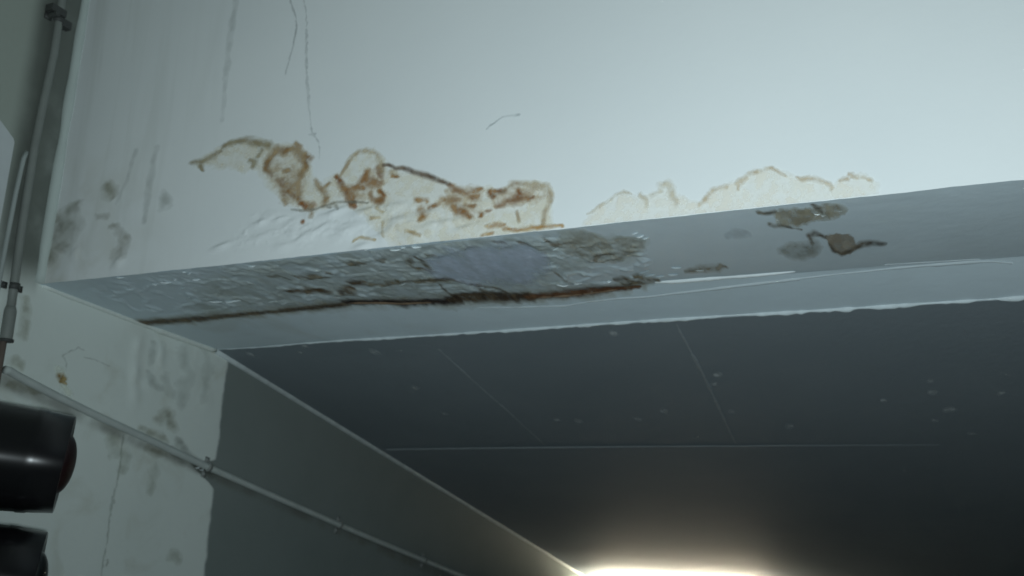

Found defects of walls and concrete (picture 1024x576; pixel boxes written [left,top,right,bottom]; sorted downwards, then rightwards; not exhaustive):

peeling [757,204,884,256]
peeling [77,232,727,320]